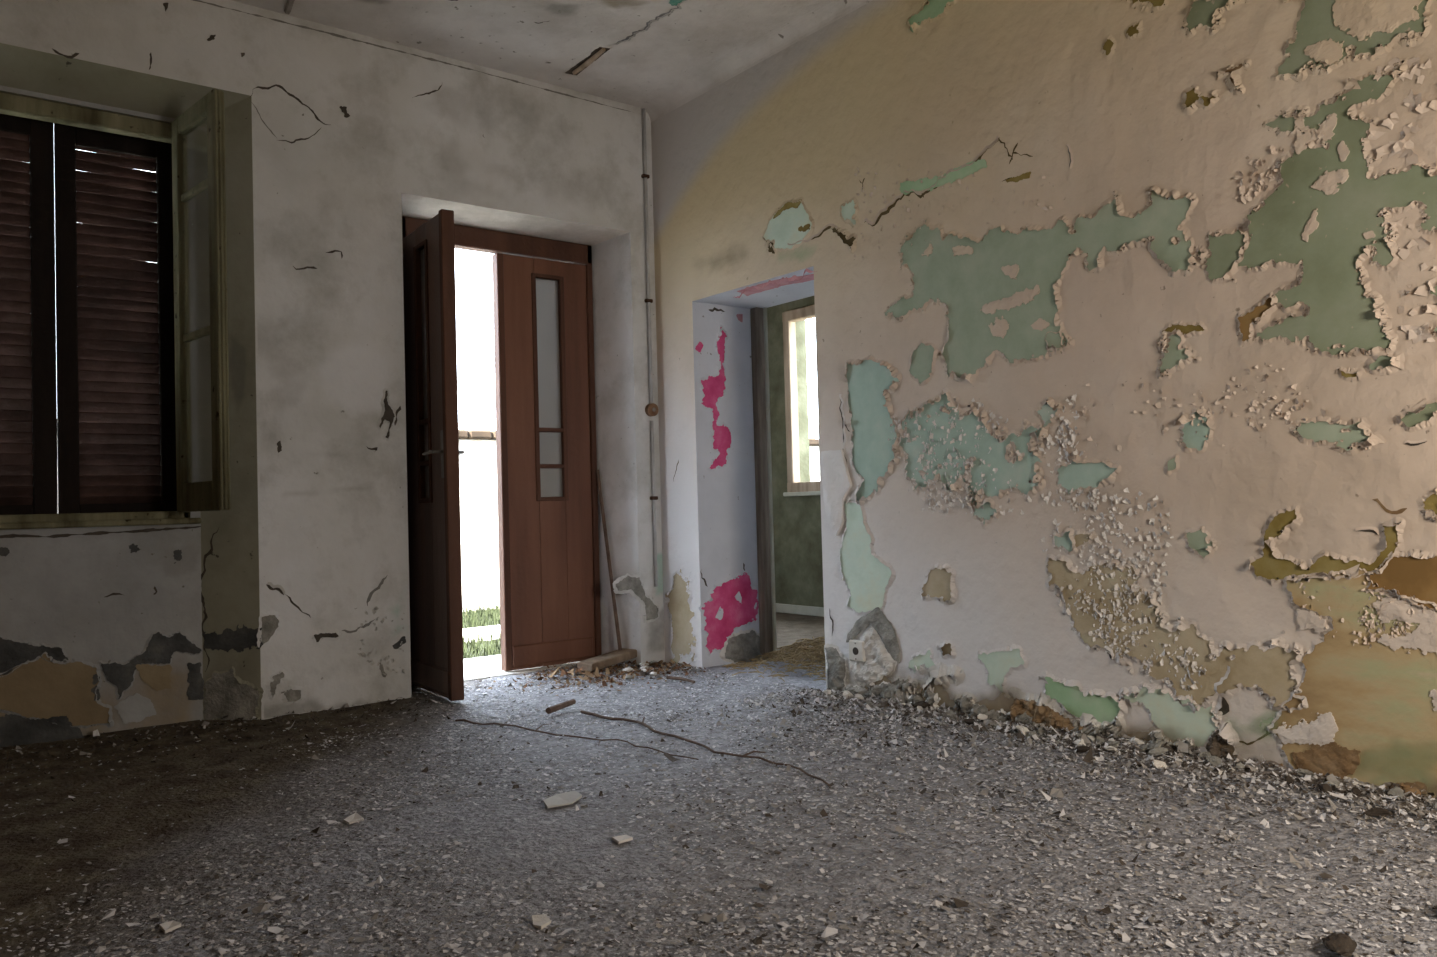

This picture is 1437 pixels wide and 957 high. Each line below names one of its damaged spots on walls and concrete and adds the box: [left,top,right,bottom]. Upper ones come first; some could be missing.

crack [53,49,79,59]
crack [193,0,638,114]
spalling [563,45,612,76]
crack [250,84,328,144]
peeling [762,196,859,257]
peeling [737,274,814,296]
peeling [695,314,743,472]
peeling [818,0,1437,820]
crack [266,582,311,618]
crack [342,576,387,633]
spalling [0,611,305,748]